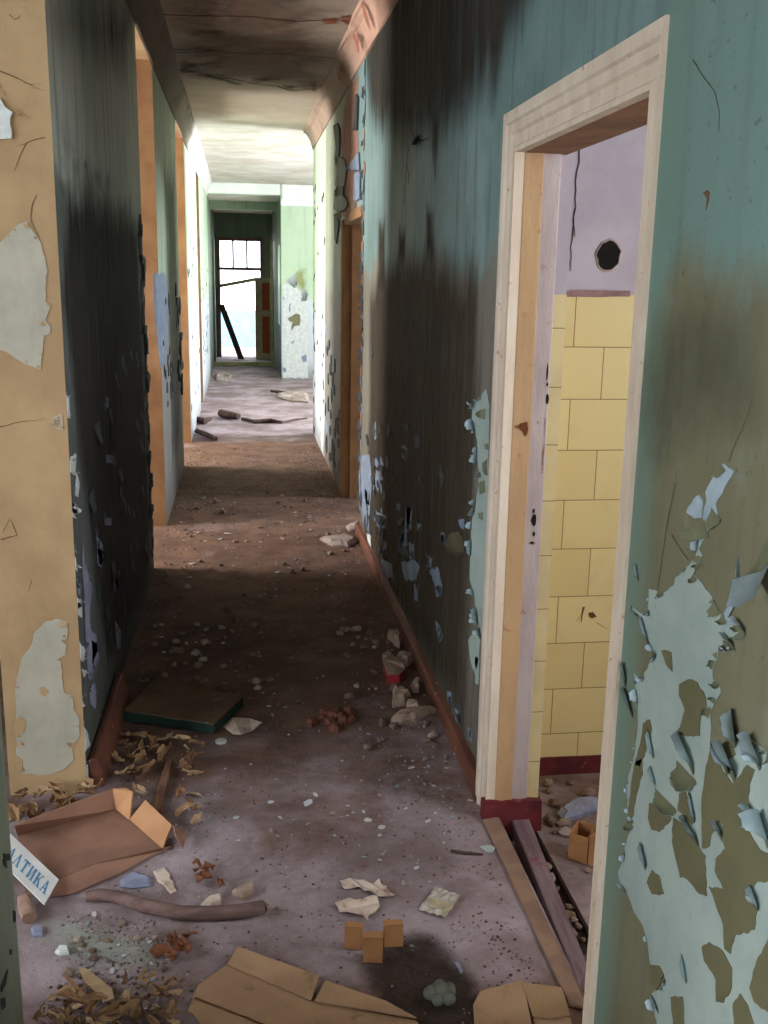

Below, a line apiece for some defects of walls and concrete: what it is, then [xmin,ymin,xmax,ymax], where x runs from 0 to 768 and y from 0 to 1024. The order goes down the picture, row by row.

spalling [0,221,51,369]
spalling [14,453,121,777]
peeling [115,214,208,573]
spalling [282,273,340,473]
spalling [313,61,442,602]
peeling [458,390,490,685]
crack [570,150,580,264]
hole [594,238,622,272]
peeling [616,458,768,1024]
crack [693,60,720,118]